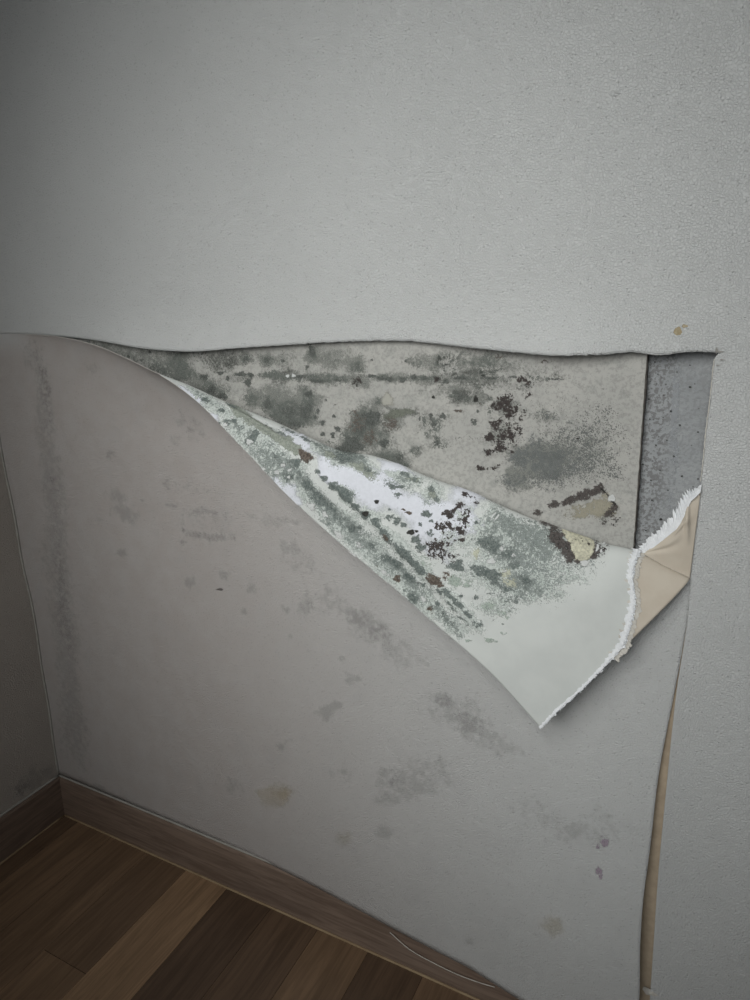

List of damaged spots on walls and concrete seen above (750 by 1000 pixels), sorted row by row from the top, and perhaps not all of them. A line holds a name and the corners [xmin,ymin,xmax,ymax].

water stain [87,341,632,643]
peeling [533,483,620,566]